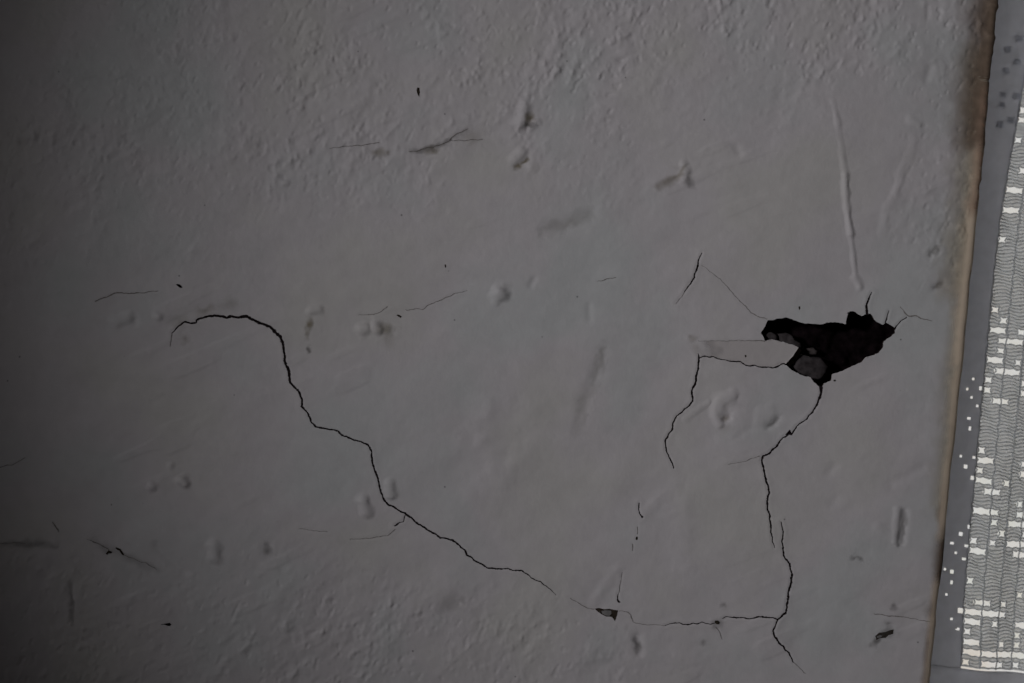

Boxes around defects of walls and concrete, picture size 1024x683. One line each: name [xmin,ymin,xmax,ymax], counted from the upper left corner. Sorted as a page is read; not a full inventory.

crack [664,253,786,469]
spalling [761,306,895,386]
crack [865,292,931,330]
crack [170,314,823,673]